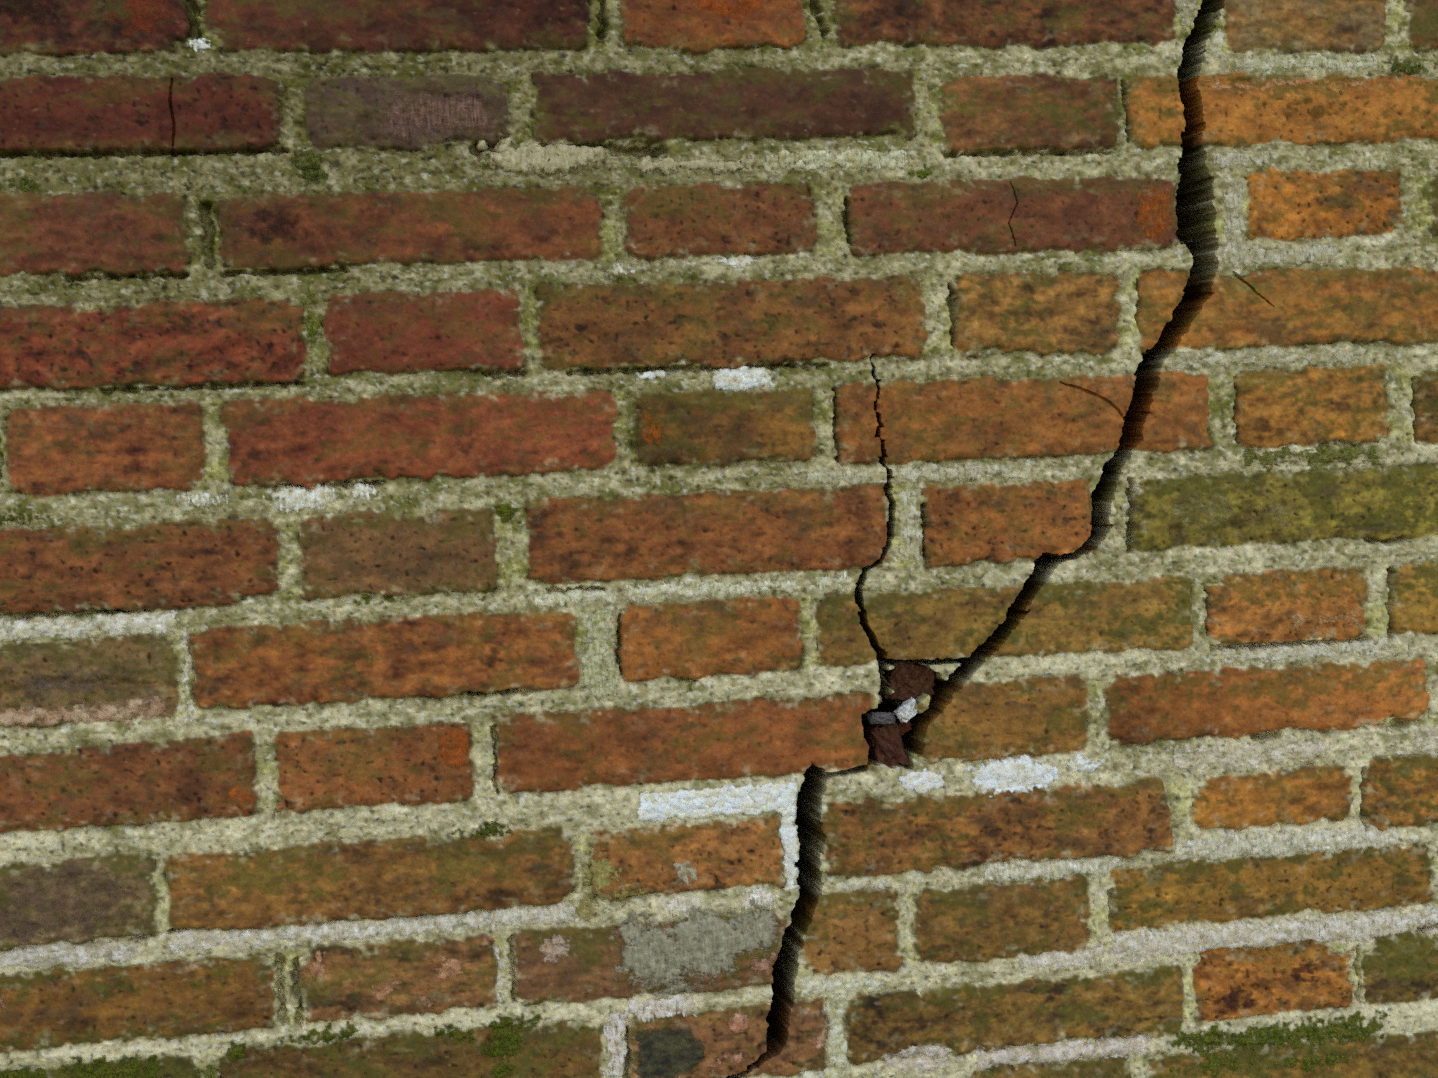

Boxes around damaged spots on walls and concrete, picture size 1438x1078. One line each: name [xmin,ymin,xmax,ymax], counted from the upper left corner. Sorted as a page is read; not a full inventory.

crack [726,0,1275,1078]
damp [899,768,945,794]
damp [964,754,1105,798]
damp [637,782,799,911]
damp [663,894,701,918]